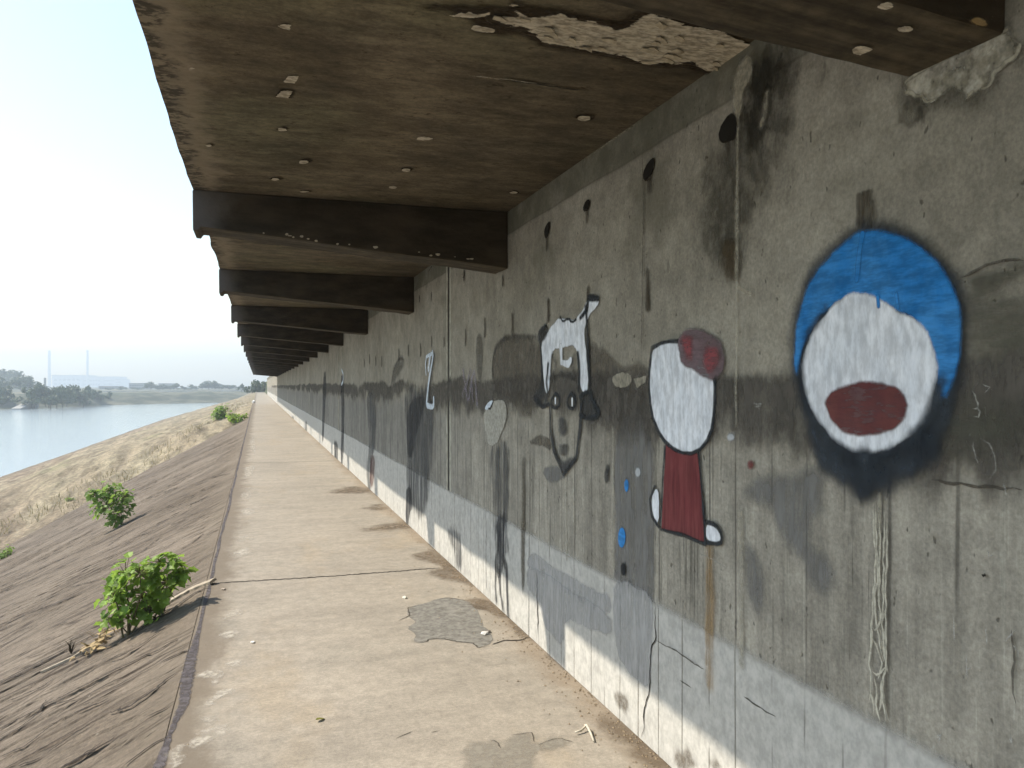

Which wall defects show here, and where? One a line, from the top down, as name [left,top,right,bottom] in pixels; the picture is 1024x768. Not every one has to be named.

peeling [424,3,750,74]
leakage [703,52,797,299]
crack [931,479,1021,490]
efflorescence [868,492,891,725]
crack [641,617,703,737]